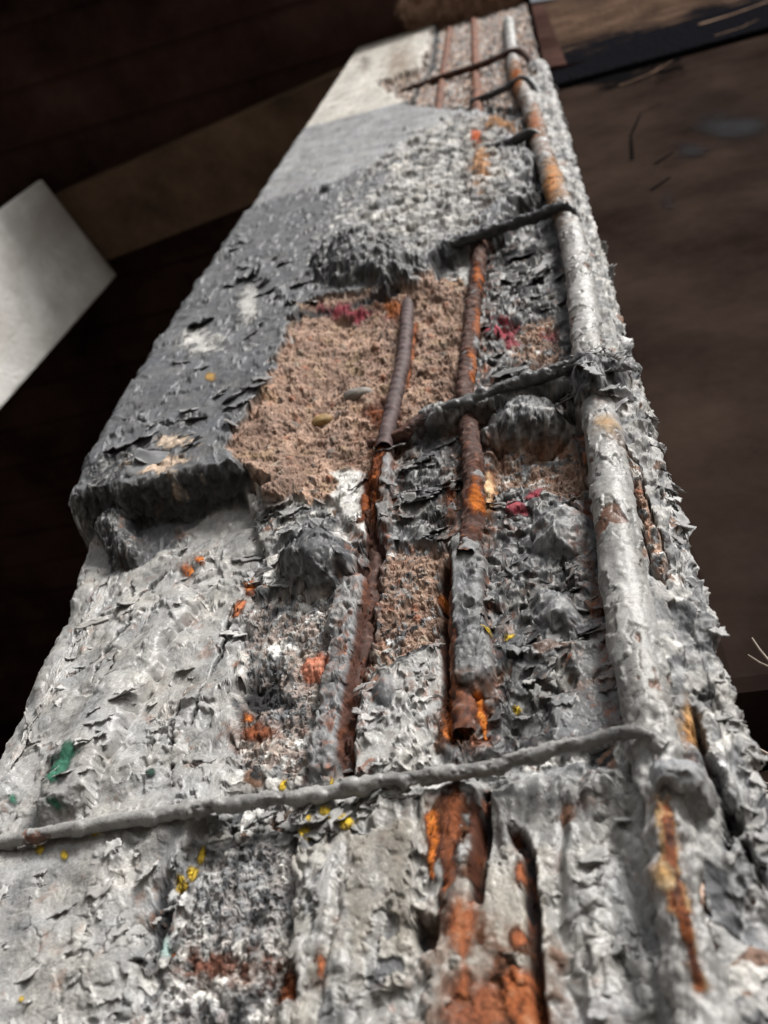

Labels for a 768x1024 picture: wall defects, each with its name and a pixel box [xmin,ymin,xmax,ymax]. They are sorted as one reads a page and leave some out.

flaking render [328,0,591,254]
corrosion [471,105,545,186]
corrosion [465,261,485,386]
peeling [479,237,572,382]
peeling [0,226,467,817]
corrosion [357,398,389,525]
corrosion [445,461,498,516]
peeling [469,438,624,745]
peeling [596,233,768,888]
corrosion [441,690,490,744]
corrosion [424,790,543,1024]
corrosion [655,796,708,991]